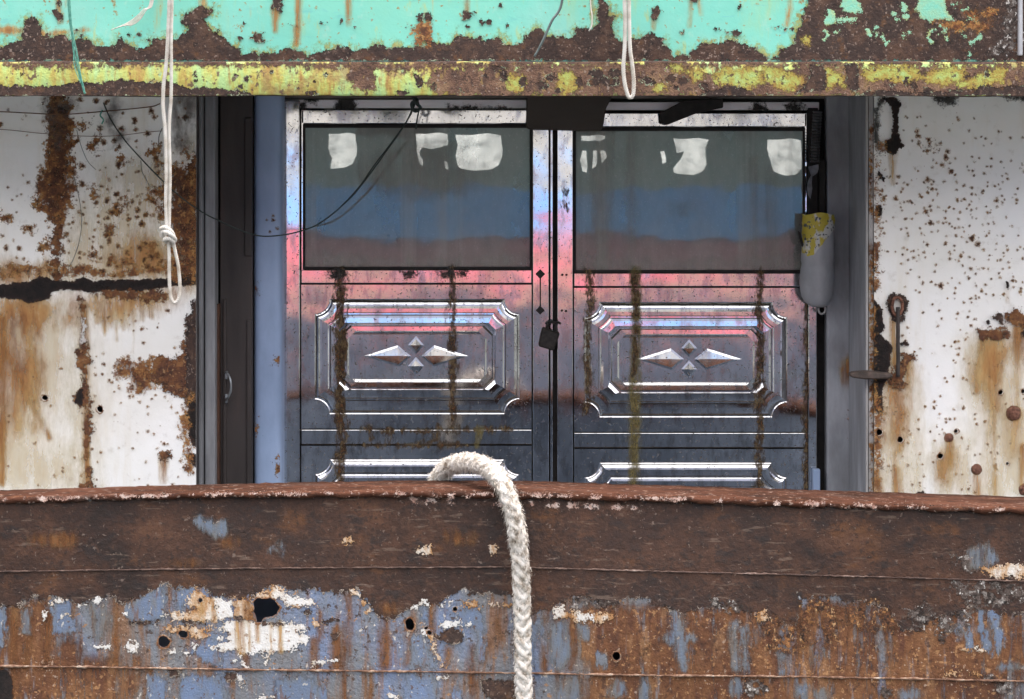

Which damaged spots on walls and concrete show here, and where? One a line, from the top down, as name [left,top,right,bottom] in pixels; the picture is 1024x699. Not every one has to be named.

peeling [669,63,806,93]
peeling [801,0,890,47]
peeling [860,0,1024,90]
water stain [327,265,513,481]
corrosion [0,0,1024,492]
water stain [582,268,596,415]
water stain [629,266,641,485]
water stain [752,267,767,488]
peeling [21,596,107,655]
peeling [122,583,324,699]
corrosion [0,490,516,699]
corrosion [519,490,1024,699]